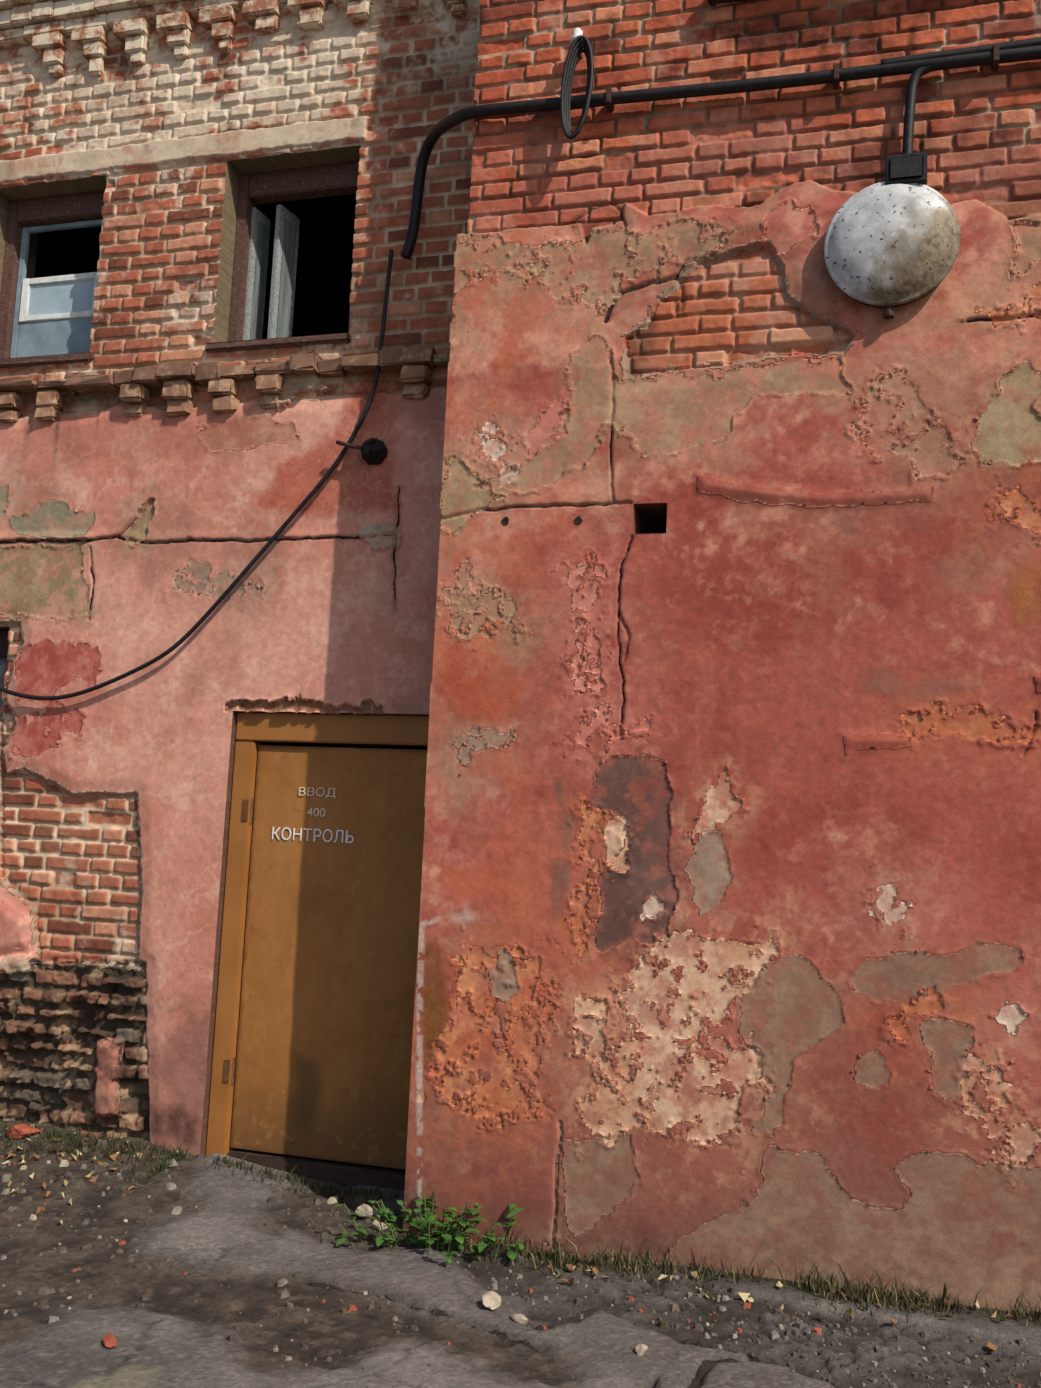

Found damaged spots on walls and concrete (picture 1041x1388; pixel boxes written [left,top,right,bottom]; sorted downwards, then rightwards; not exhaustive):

peeling [440,200,1041,534]
peeling [0,485,95,539]
crack [0,487,400,610]
flaking render [358,517,402,550]
crack [450,503,612,518]
crack [617,538,632,727]
flaking render [0,618,144,971]
peeling [453,727,518,775]
peeling [539,553,1041,1314]
peeling [416,944,556,1128]